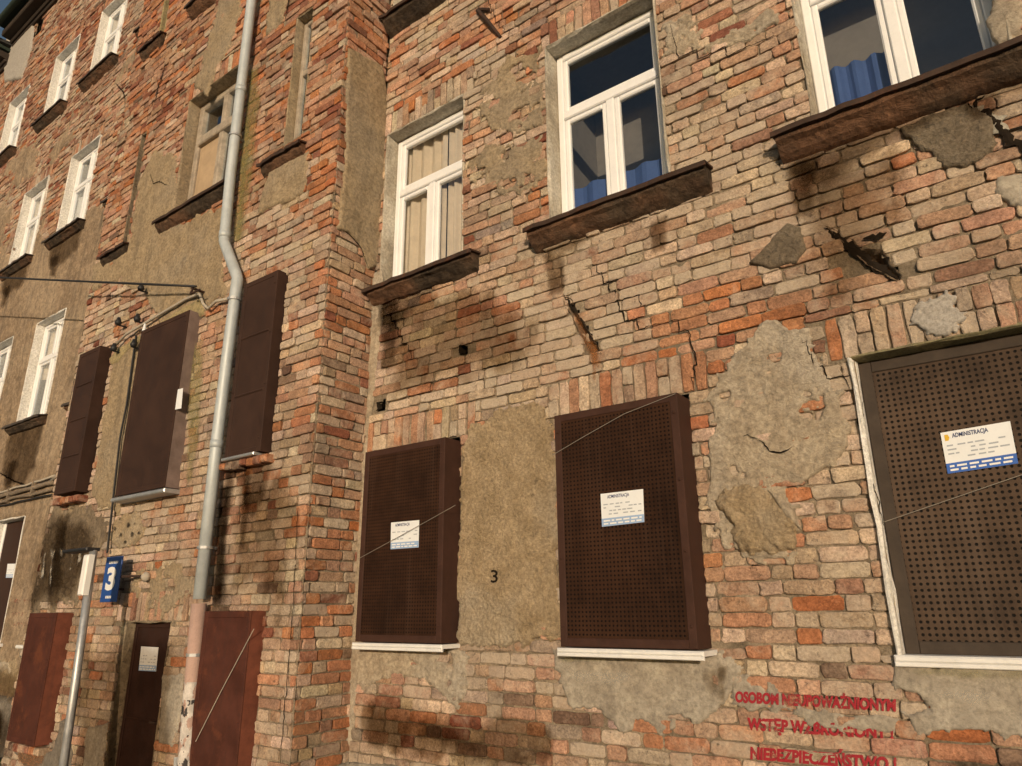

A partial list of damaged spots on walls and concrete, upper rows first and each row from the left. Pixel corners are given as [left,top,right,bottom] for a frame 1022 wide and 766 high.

crack [968,95,1022,153]